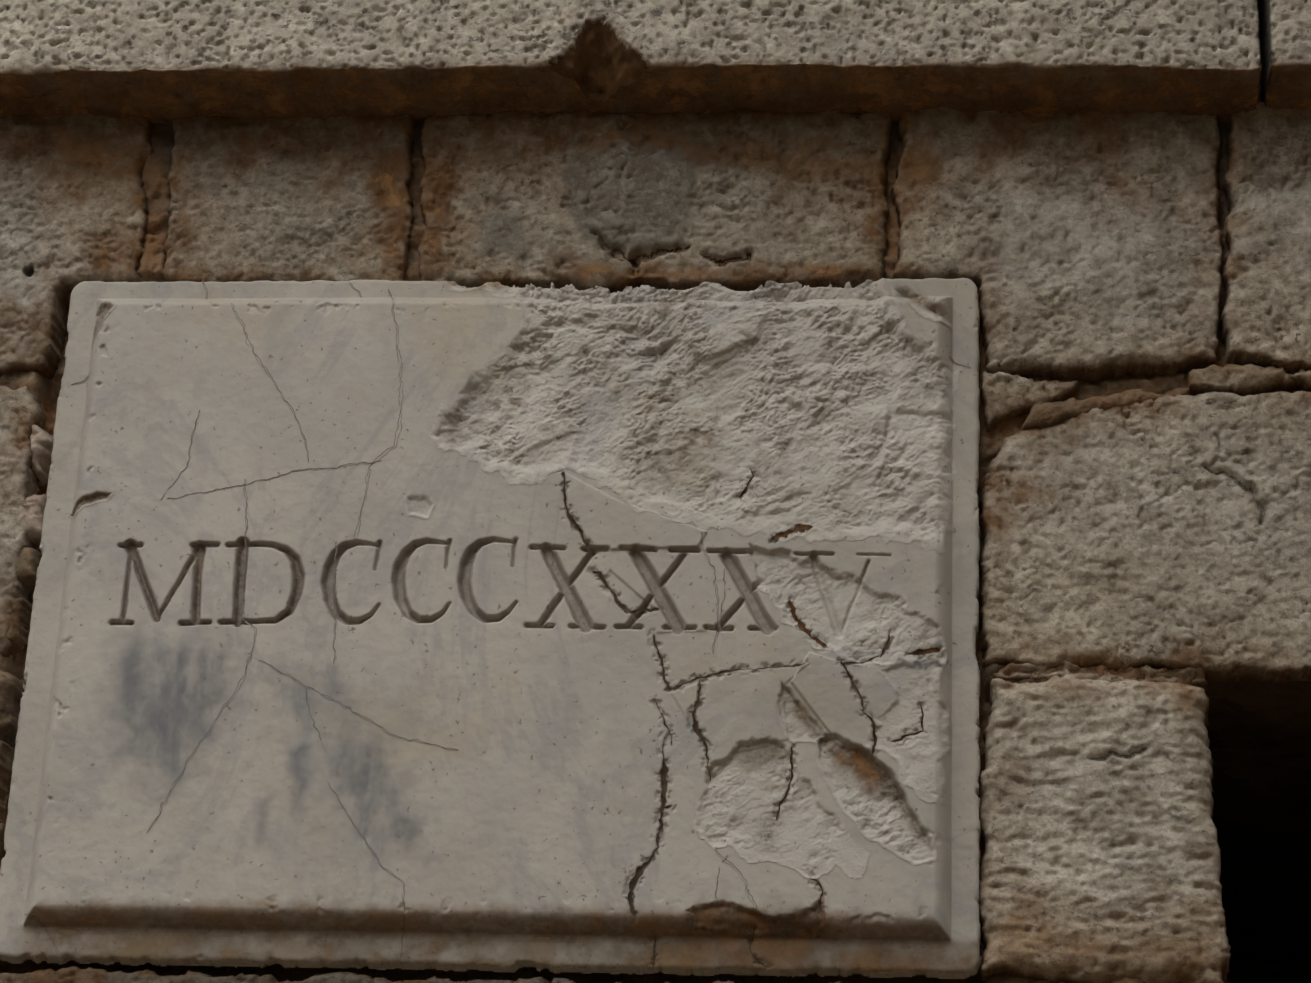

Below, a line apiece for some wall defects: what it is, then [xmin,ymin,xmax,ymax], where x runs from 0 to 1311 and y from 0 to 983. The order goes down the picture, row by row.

crack [147,280,458,956]
spalling [429,278,962,941]
crack [562,470,940,971]